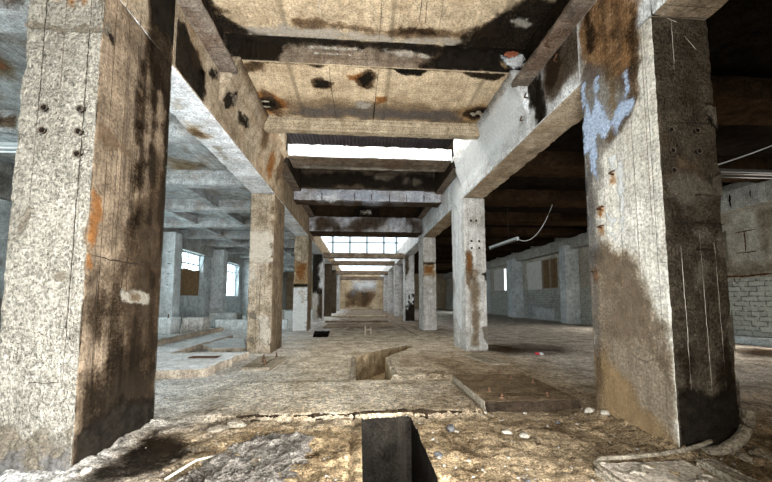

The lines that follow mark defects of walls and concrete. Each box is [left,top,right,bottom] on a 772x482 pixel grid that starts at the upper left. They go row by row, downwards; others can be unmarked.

damp [207,0,554,72]
spalling [503,51,525,67]
peeling [388,68,438,76]
peeling [457,71,505,80]
damp [589,245,740,447]